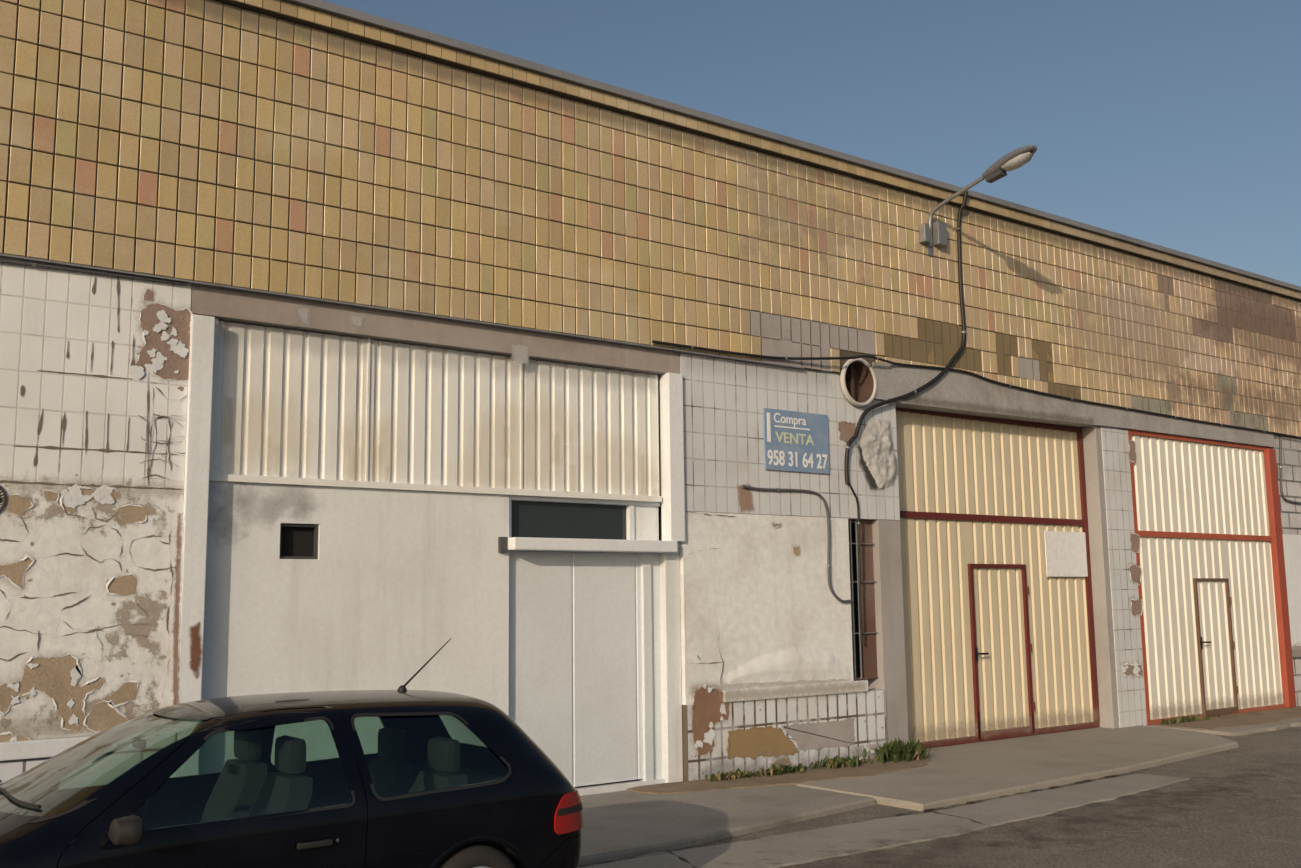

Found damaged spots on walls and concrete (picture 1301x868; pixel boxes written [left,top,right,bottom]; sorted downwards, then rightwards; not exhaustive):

spalling [130,288,193,391]
peeling [750,311,1081,400]
peeling [1216,374,1238,411]
peeling [1192,278,1297,344]
spalling [3,474,148,525]
crack [0,277,188,698]
spalling [0,541,36,599]
spalling [106,570,136,606]
rust [172,514,202,728]
spalling [0,731,31,742]
spalling [0,653,140,733]
spalling [692,683,883,766]